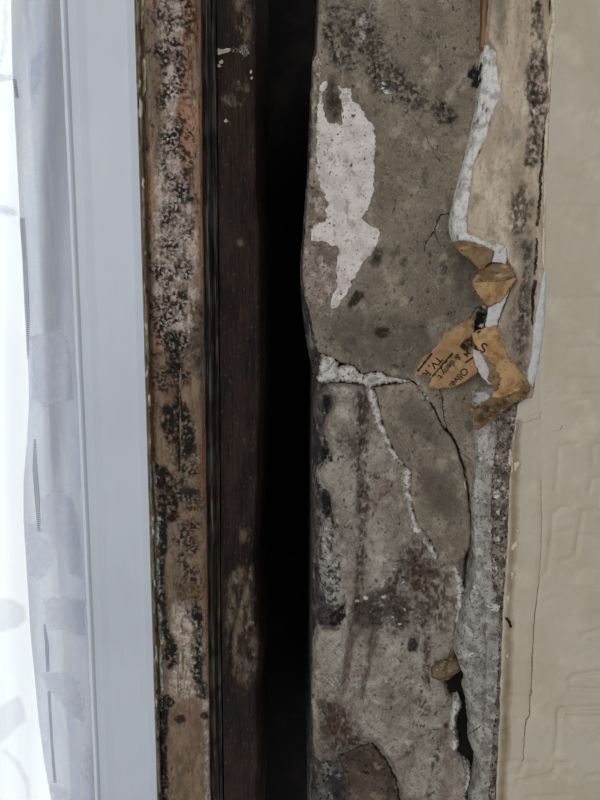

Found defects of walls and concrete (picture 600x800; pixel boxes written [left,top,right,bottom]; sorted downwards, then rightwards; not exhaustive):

damp [323,0,458,124]
mould [524,0,547,167]
peeling [303,57,380,317]
mould [512,187,534,234]
mould [149,0,207,699]
mould [517,242,531,363]
crack [376,381,471,521]
crack [522,511,542,761]
mould [159,695,185,800]
crack [445,670,474,769]